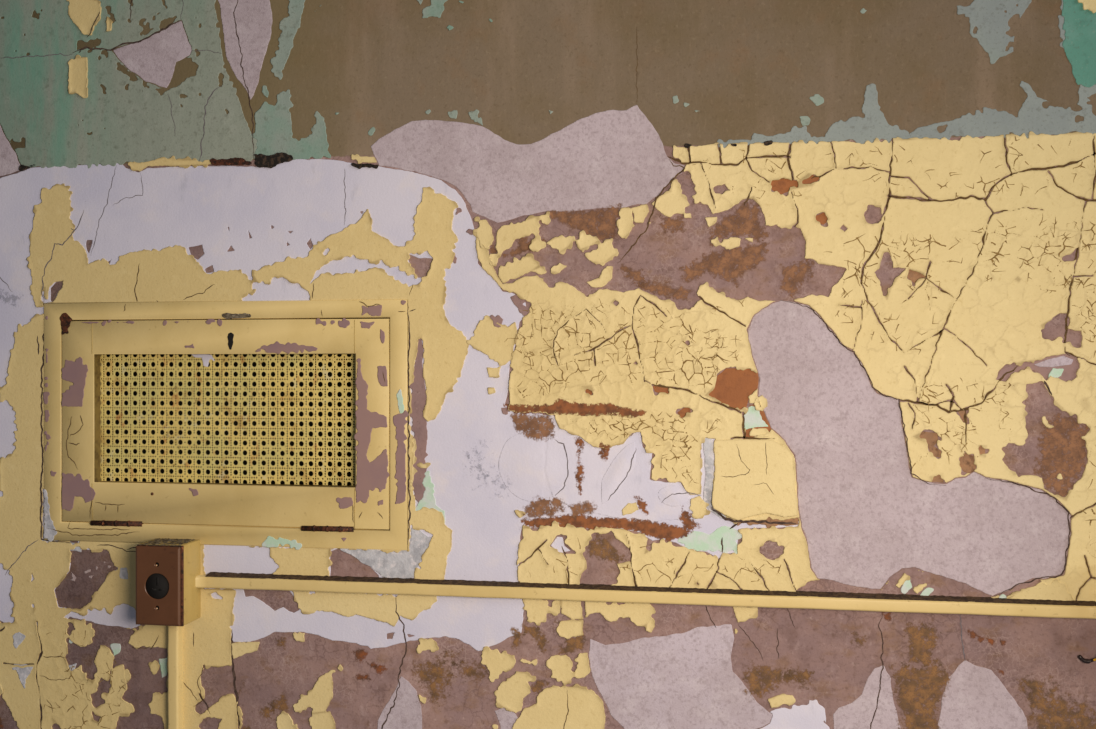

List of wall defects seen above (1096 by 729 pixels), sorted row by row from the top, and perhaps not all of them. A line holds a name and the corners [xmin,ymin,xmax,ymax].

flaking render [218,0,273,100]
peeling [0,314,141,729]
peeling [26,105,1096,601]
rust [503,398,646,440]
rust [521,437,699,563]
crack [506,295,796,659]
crack [618,136,1096,599]
peeling [183,588,260,729]
crack [381,604,407,729]
flaking render [481,599,796,729]
flaking render [833,666,901,729]
flaking render [938,661,1028,729]